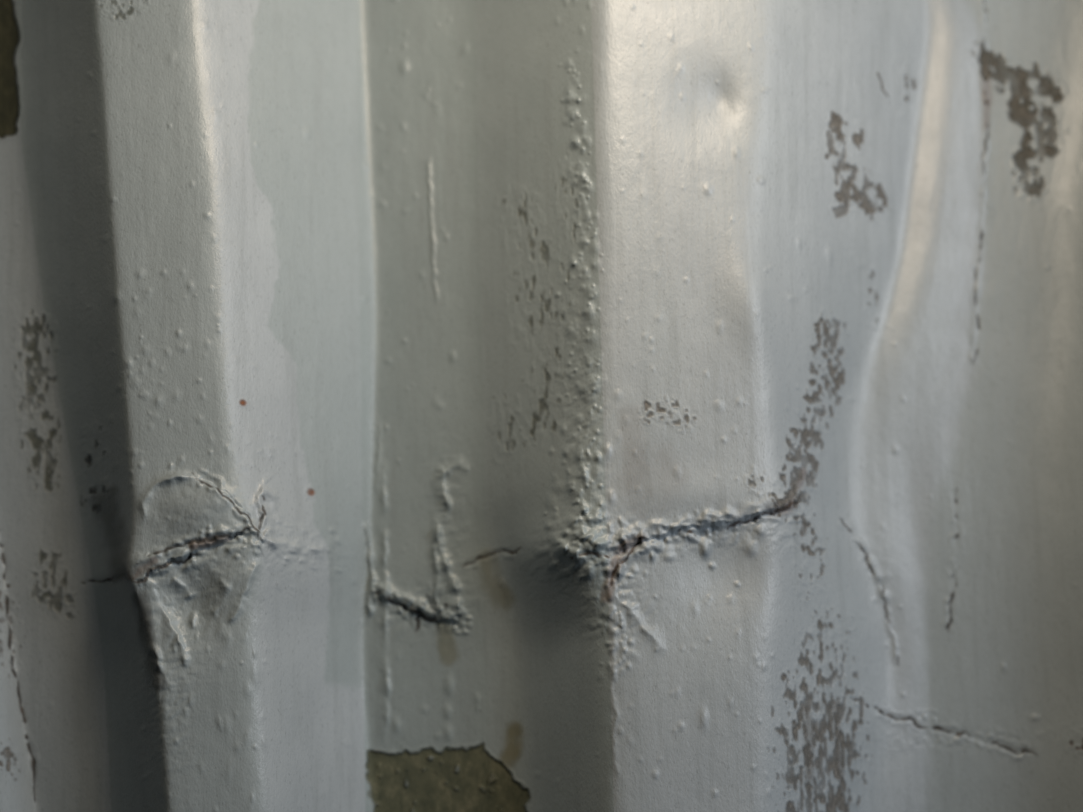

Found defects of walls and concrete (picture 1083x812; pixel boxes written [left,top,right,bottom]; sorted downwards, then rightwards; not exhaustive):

peeling [0,0,19,138]
peeling [978,44,1063,171]
peeling [826,112,887,219]
peeling [772,319,845,556]
crack [90,481,266,583]
crack [376,592,448,630]
crack [571,537,644,585]
crack [730,502,796,526]
crack [842,521,887,618]
peeling [366,744,530,812]
peeling [778,642,863,812]
crack [857,699,964,736]